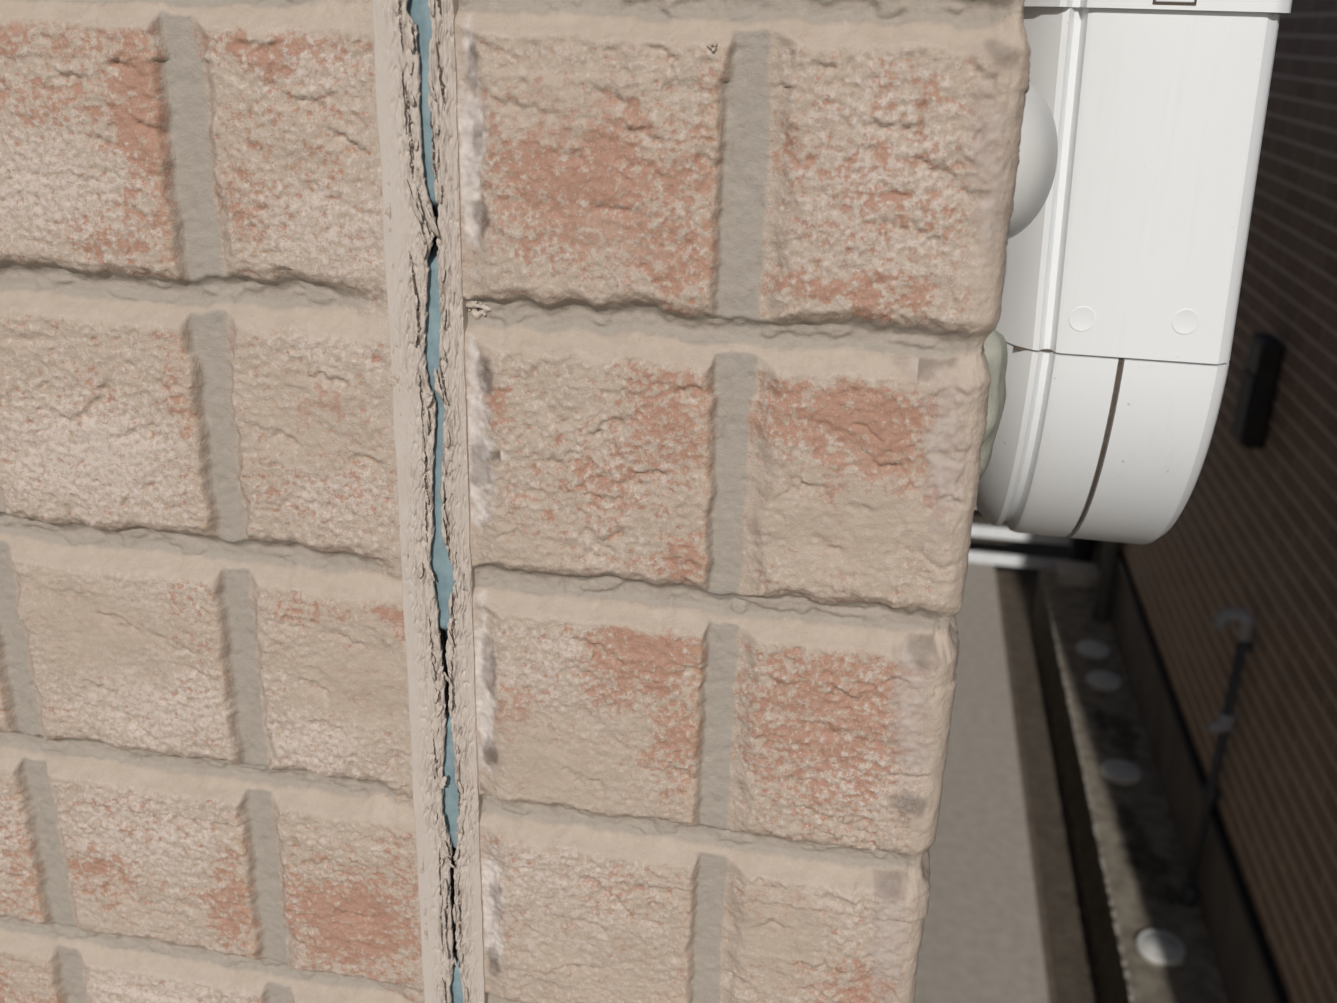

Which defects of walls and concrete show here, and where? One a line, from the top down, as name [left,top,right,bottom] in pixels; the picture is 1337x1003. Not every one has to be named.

crack [398,0,468,1003]